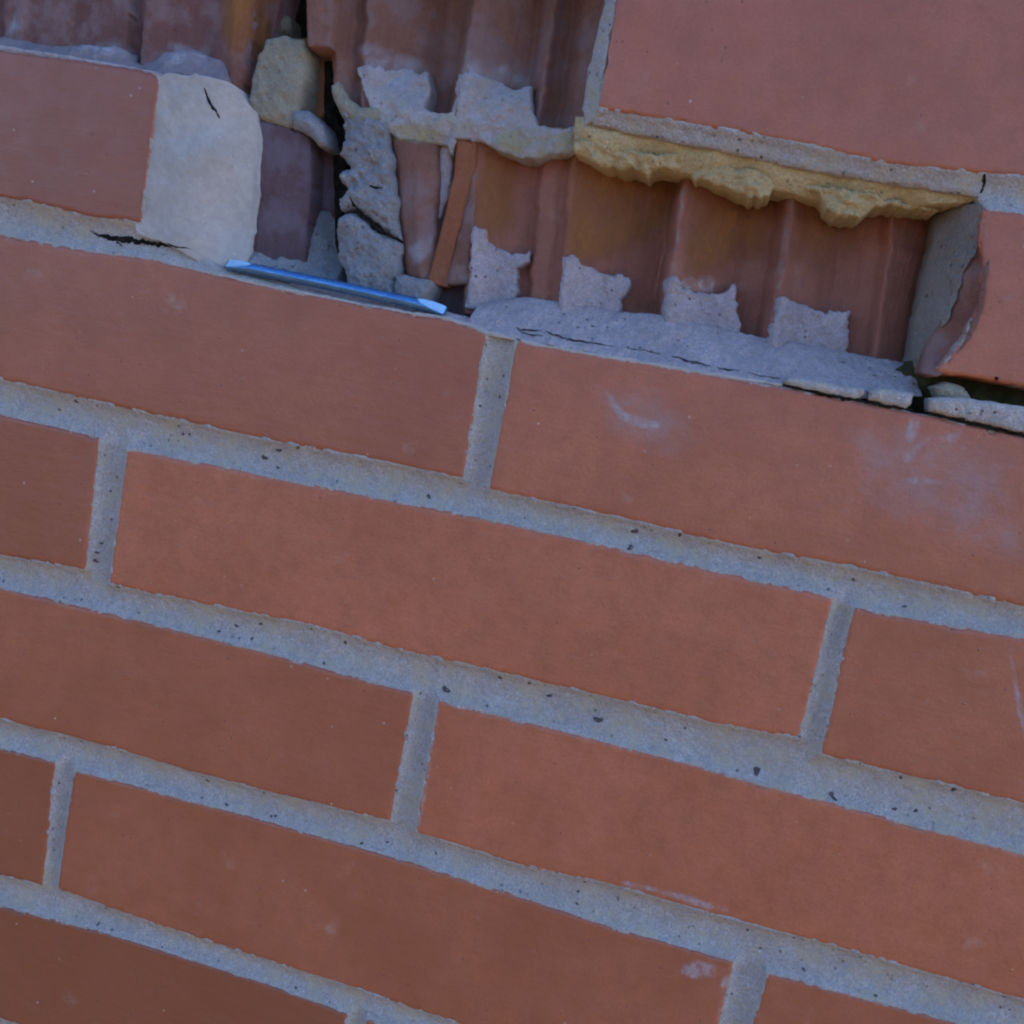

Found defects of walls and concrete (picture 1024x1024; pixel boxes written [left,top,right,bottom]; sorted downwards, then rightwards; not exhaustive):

crack [204,88,220,119]
crack [90,230,190,249]
spalling [0,0,990,399]
crack [516,327,1024,437]